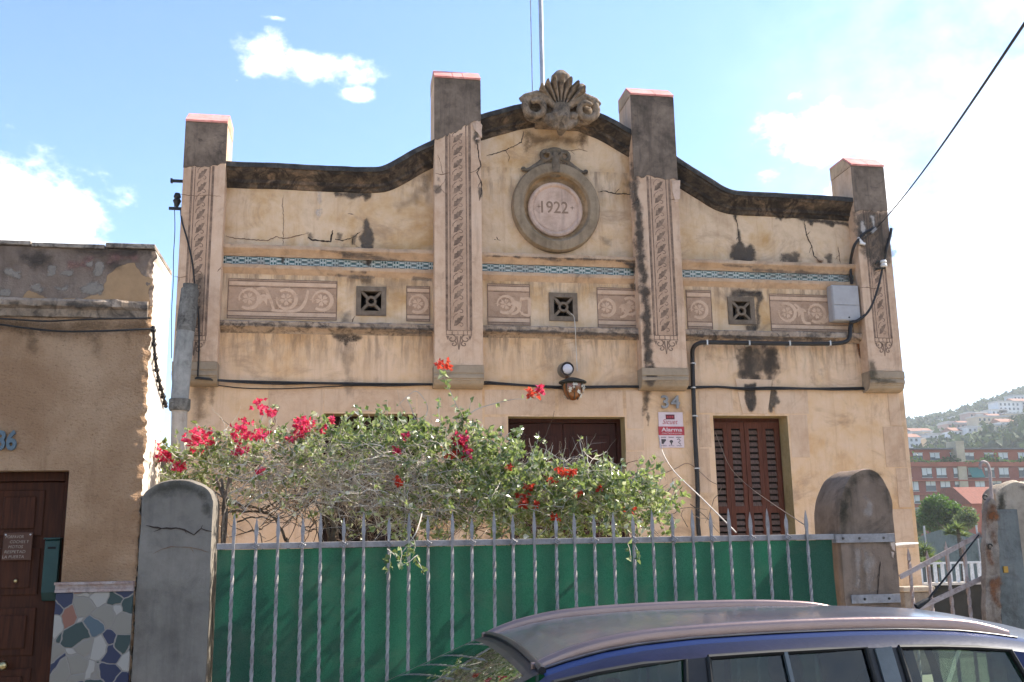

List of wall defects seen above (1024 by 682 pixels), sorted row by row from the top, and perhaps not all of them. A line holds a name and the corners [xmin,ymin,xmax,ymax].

crack [436,131,524,201]
crack [227,200,360,244]
damp [335,219,397,279]
damp [727,231,849,278]
crack [804,221,840,262]
peeling [0,261,153,304]
damp [486,162,657,420]
damp [721,290,832,412]
crack [146,525,212,554]